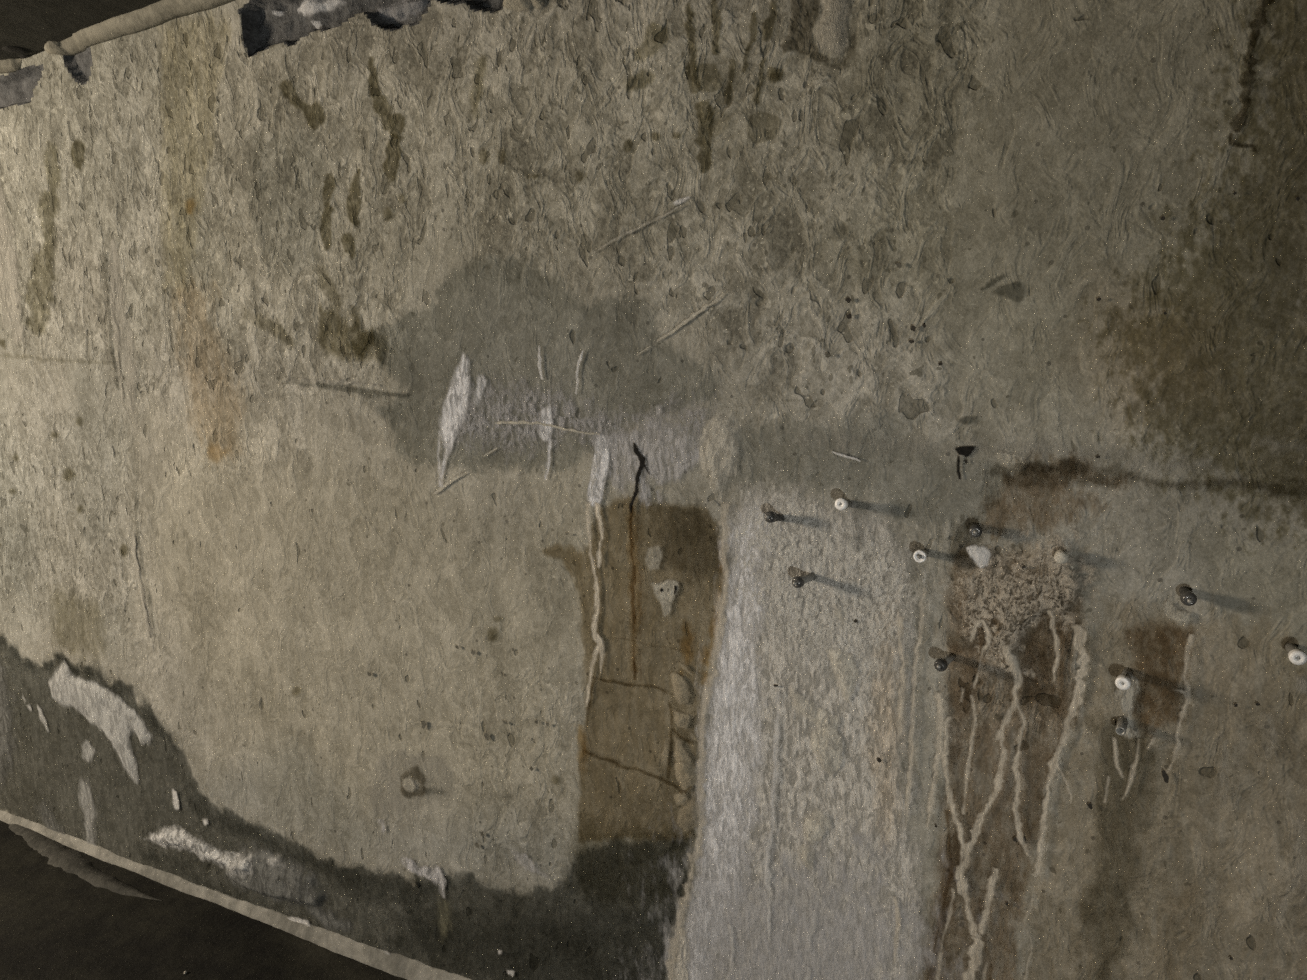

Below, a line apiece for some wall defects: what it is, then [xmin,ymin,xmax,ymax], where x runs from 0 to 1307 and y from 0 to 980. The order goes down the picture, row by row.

spalling [238,0,504,57]
spalling [0,64,44,109]
spalling [63,47,93,85]
crack [1229,0,1275,152]
crack [629,443,650,512]
damp [955,446,975,480]
damp [1176,635,1194,754]
damp [666,486,1089,980]
damp [1108,738,1138,795]
damp [150,826,251,875]
damp [401,858,446,897]